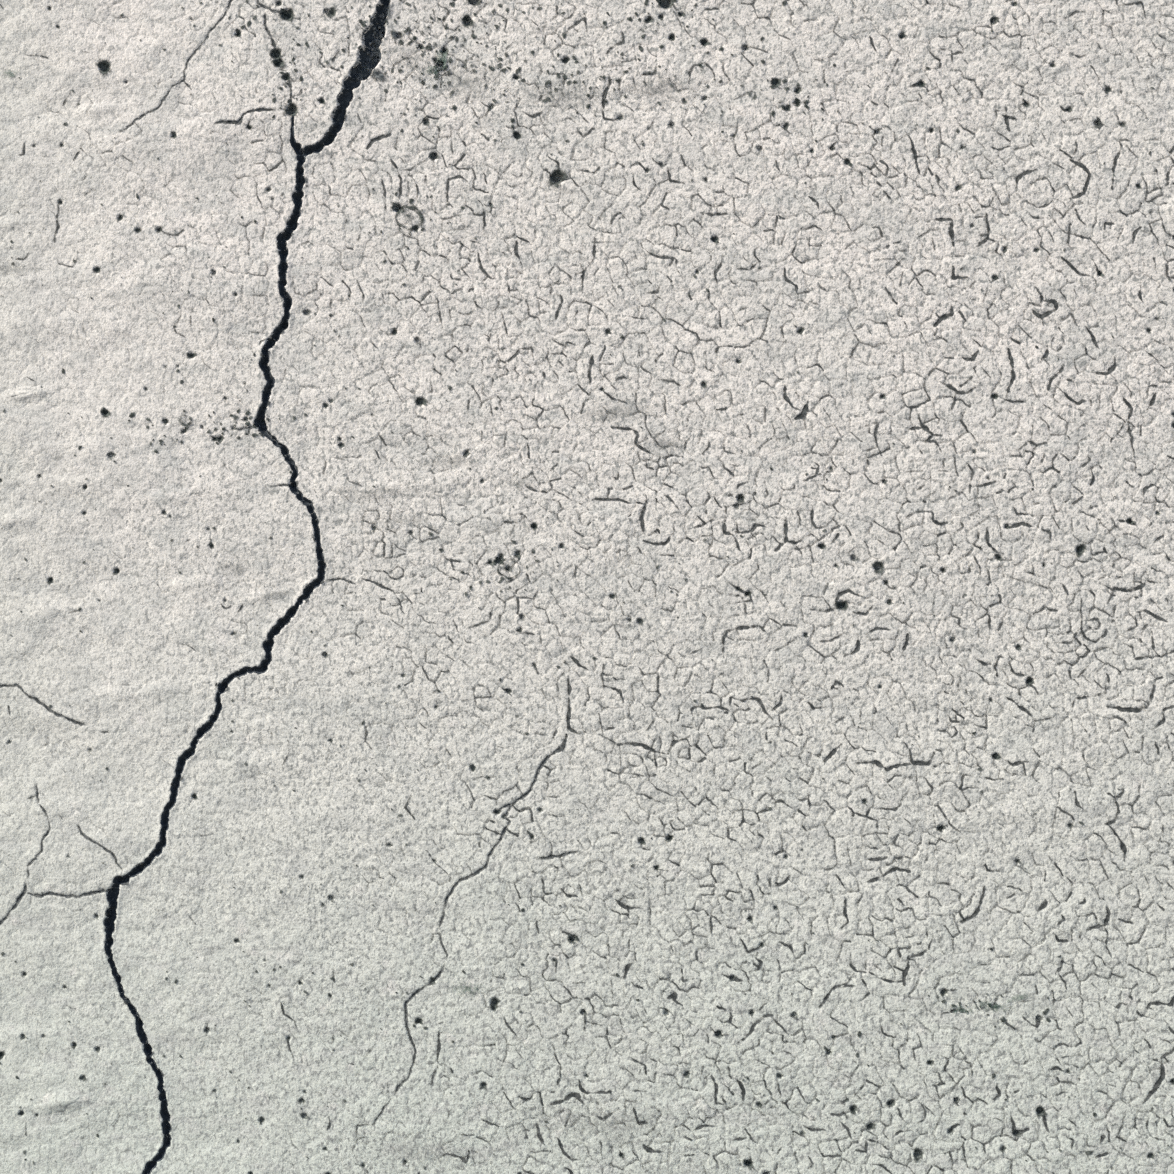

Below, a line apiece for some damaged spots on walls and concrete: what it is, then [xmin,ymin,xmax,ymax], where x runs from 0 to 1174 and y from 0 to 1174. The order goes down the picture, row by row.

crack [432,0,522,119]
crack [734,0,813,89]
crack [16,205,78,267]
crack [844,259,889,358]
crack [715,389,751,438]
crack [322,415,453,480]
crack [458,493,527,536]
crack [0,684,128,738]
crack [391,645,511,736]
crack [250,996,297,1057]
crack [429,1022,453,1090]
crack [441,1134,488,1169]